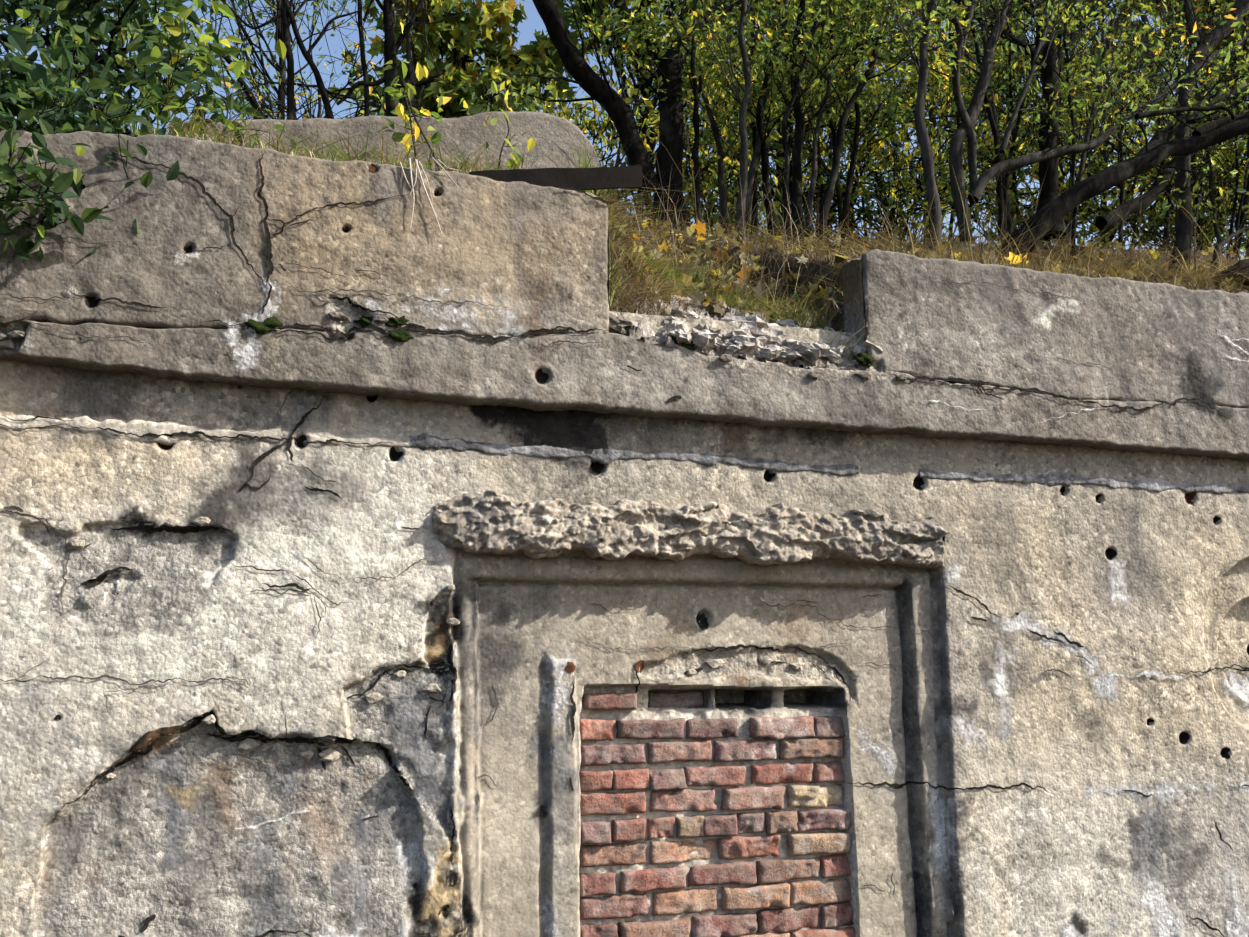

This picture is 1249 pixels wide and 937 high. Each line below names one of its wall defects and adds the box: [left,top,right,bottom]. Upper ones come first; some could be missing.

crack [102,145,617,347]
crack [0,390,403,499]
crack [885,372,1229,416]
leakage [1166,290,1249,419]
crack [0,506,91,614]
crack [233,527,427,638]
crack [948,585,1091,664]
spalling [20,584,463,937]
leakage [858,729,897,775]
leakage [925,781,972,874]
crack [843,781,1058,795]
leakage [944,695,985,746]